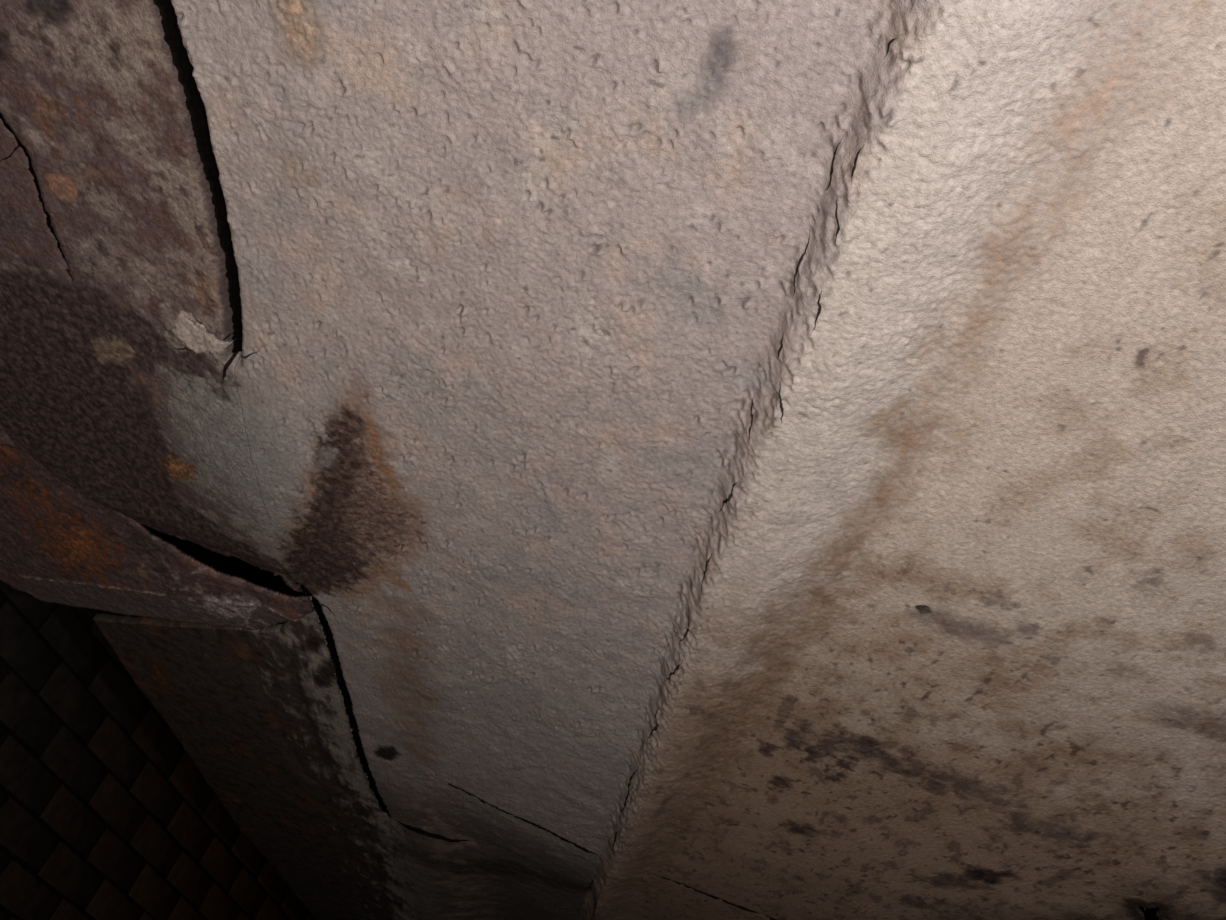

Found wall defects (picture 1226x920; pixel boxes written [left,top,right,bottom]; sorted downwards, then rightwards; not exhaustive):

crack [0,113,75,286]
crack [153,0,259,380]
crack [747,139,862,448]
crack [718,479,739,514]
crack [289,576,469,842]
crack [646,552,714,743]
crack [449,770,637,917]
crack [658,876,776,920]